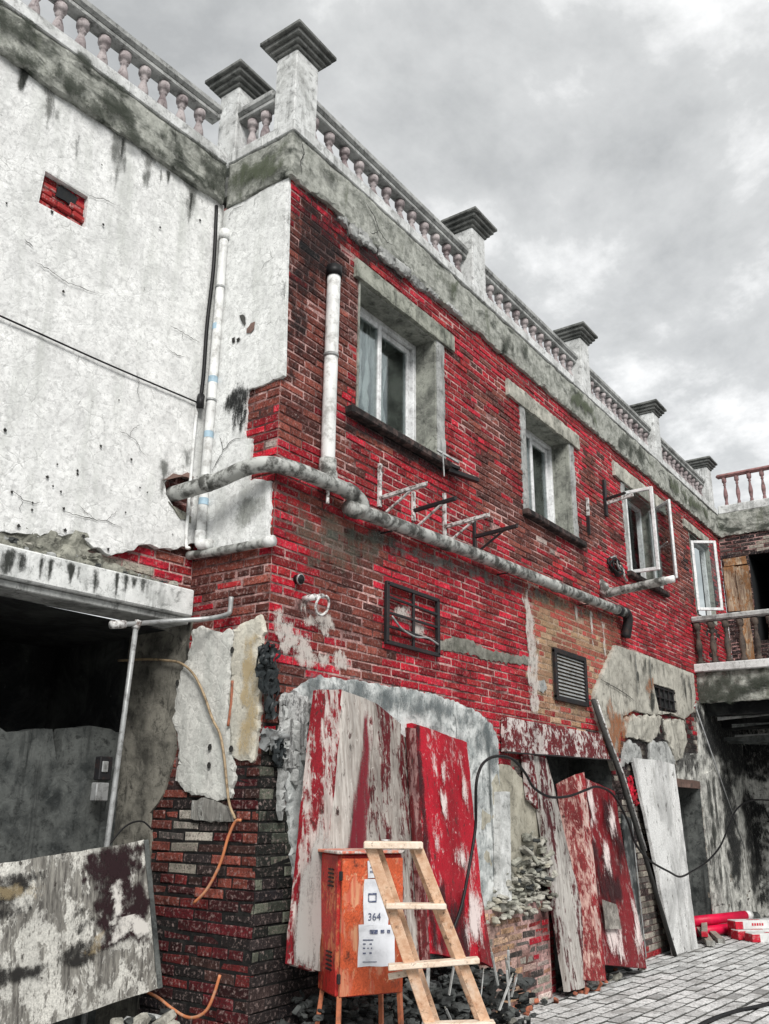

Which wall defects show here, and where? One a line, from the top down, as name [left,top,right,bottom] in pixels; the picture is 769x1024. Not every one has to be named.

leakage [10,48,64,118]
leakage [77,51,128,97]
leakage [75,94,184,183]
leakage [186,175,214,219]
leakage [225,383,250,430]
leakage [1,549,26,573]
spalling [0,524,179,587]
leakage [115,573,146,594]
leakage [626,654,665,712]
flaking render [172,614,267,822]
leakage [681,668,769,917]